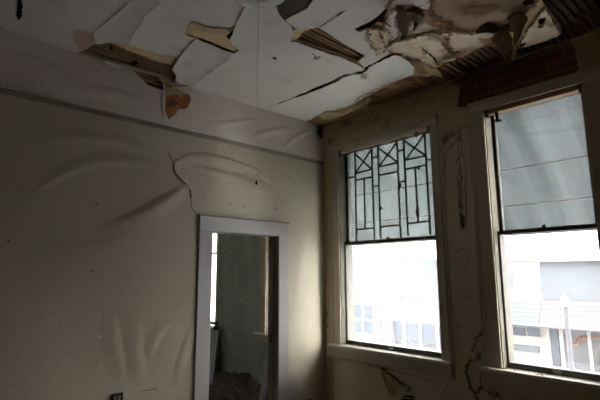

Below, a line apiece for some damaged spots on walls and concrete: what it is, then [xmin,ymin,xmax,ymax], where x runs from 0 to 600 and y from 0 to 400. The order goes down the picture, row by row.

peeling [186,21,238,52]
peeling [277,0,312,21]
peeling [396,7,425,39]
peeling [114,43,179,65]
flaking render [450,12,580,108]
damp [352,56,430,106]
flaking render [162,84,191,121]
flaking render [485,85,581,116]